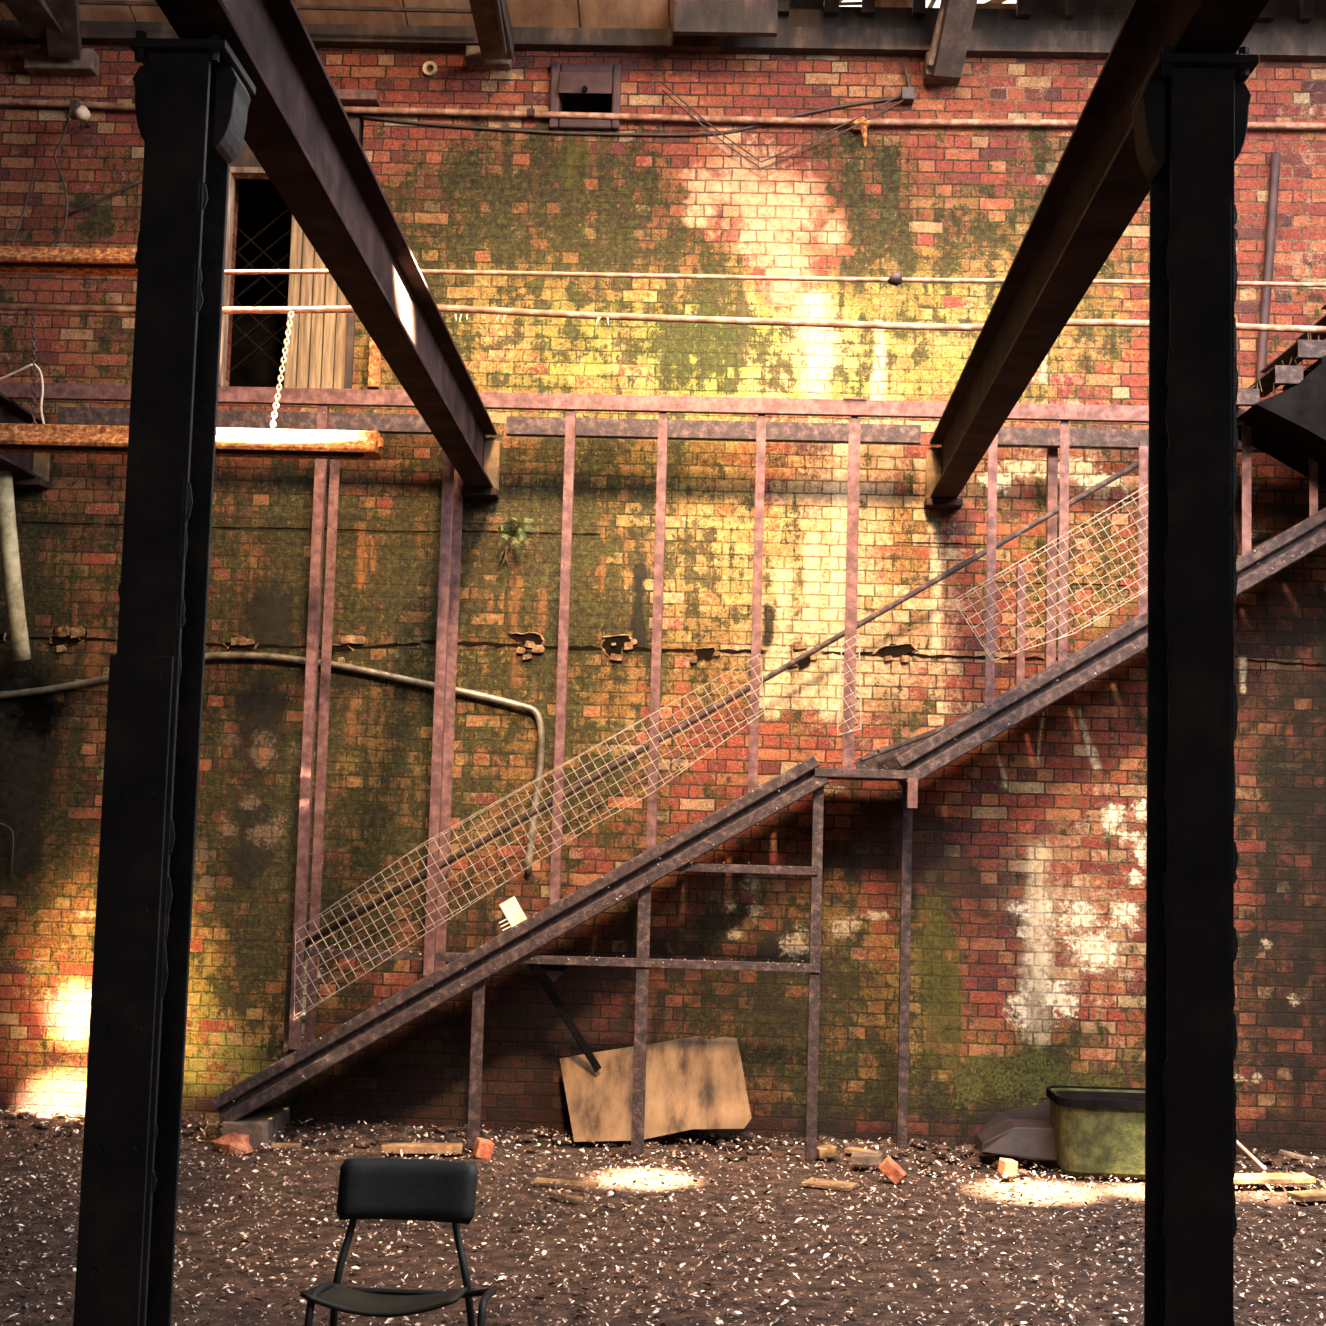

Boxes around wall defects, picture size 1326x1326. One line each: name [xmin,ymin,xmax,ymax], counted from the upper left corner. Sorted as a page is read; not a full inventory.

spalling [508,632,545,660]
spalling [599,634,637,661]
crack [206,636,1058,671]
spalling [690,647,721,663]
spalling [868,643,918,663]
efflorescence [1101,799,1147,885]
efflorescence [1004,890,1139,1036]